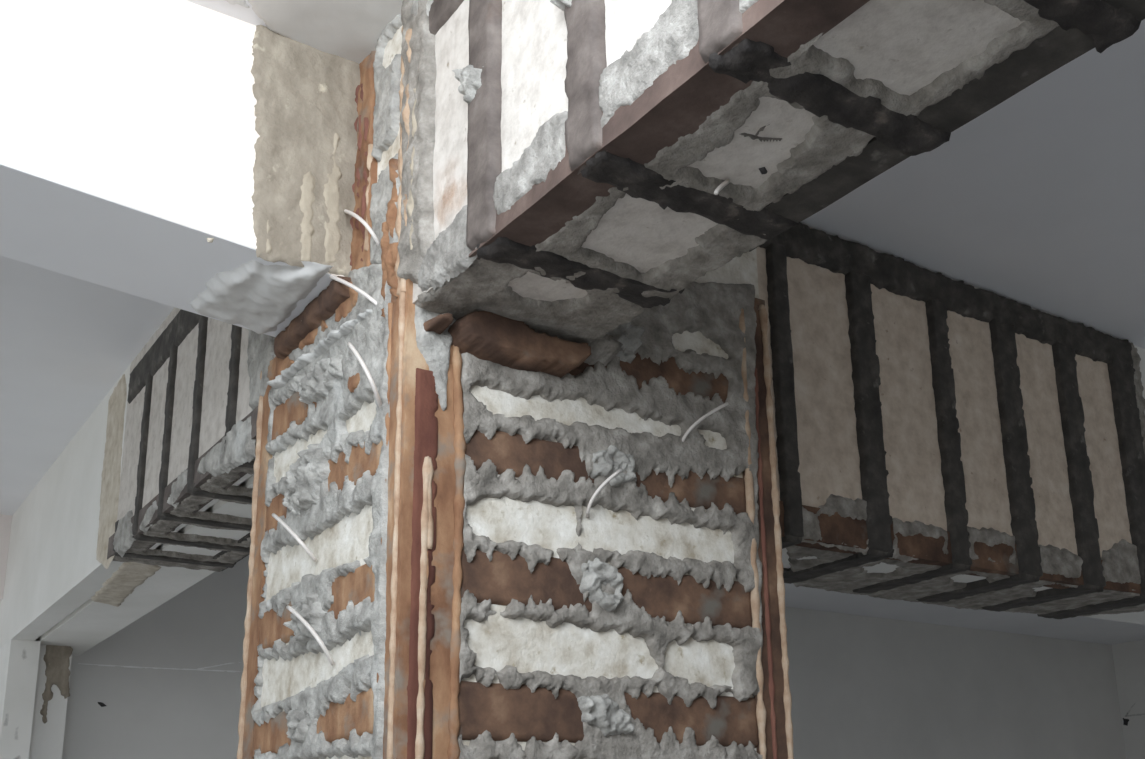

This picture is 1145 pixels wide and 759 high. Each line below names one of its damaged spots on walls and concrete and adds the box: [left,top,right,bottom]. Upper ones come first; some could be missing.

spalling [91,307,253,607]
spalling [756,247,780,501]
spalling [787,257,862,508]
spalling [871,284,947,531]
spalling [946,310,1013,536]
spalling [1015,333,1078,555]
spalling [1075,354,1132,557]
spalling [1131,343,1145,454]
spalling [40,645,73,724]